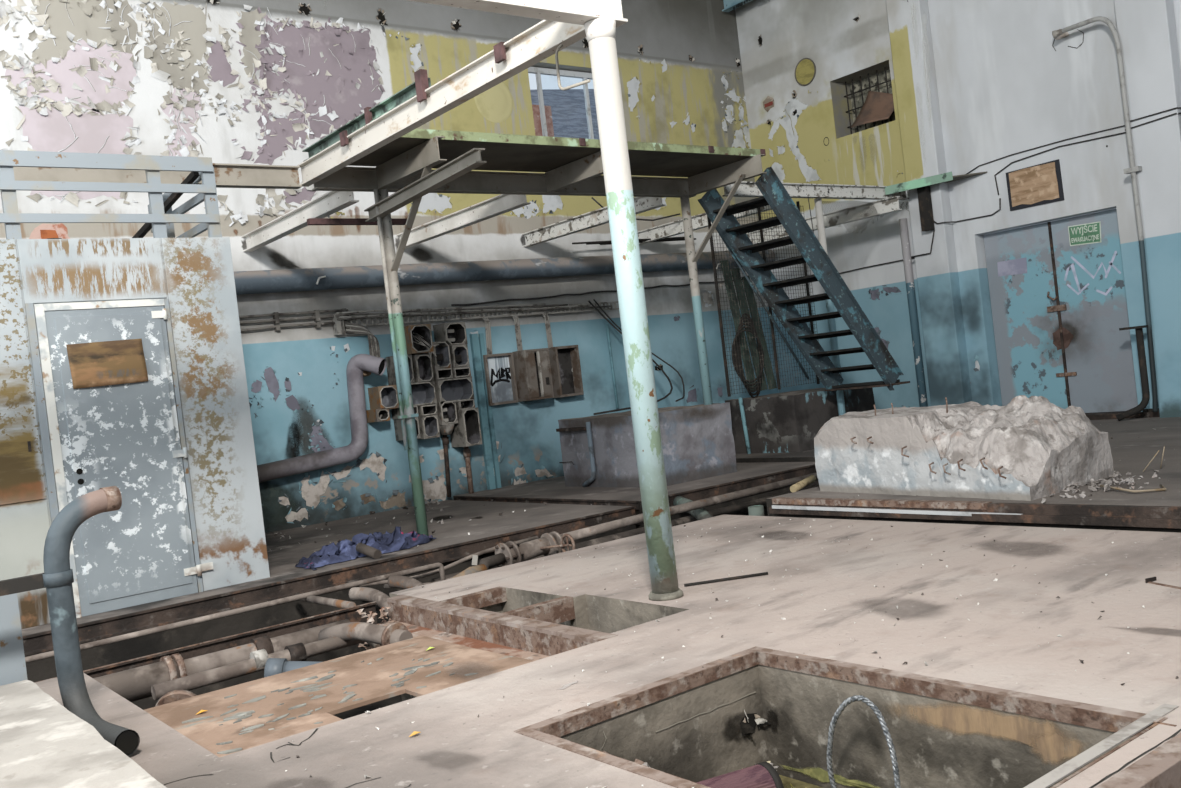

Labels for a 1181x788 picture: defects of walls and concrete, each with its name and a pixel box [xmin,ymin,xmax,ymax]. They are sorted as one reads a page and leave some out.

peeling [0,0,424,165]
peeling [26,191,138,207]
peeling [204,181,317,226]
peeling [409,193,452,214]
peeling [511,195,564,219]